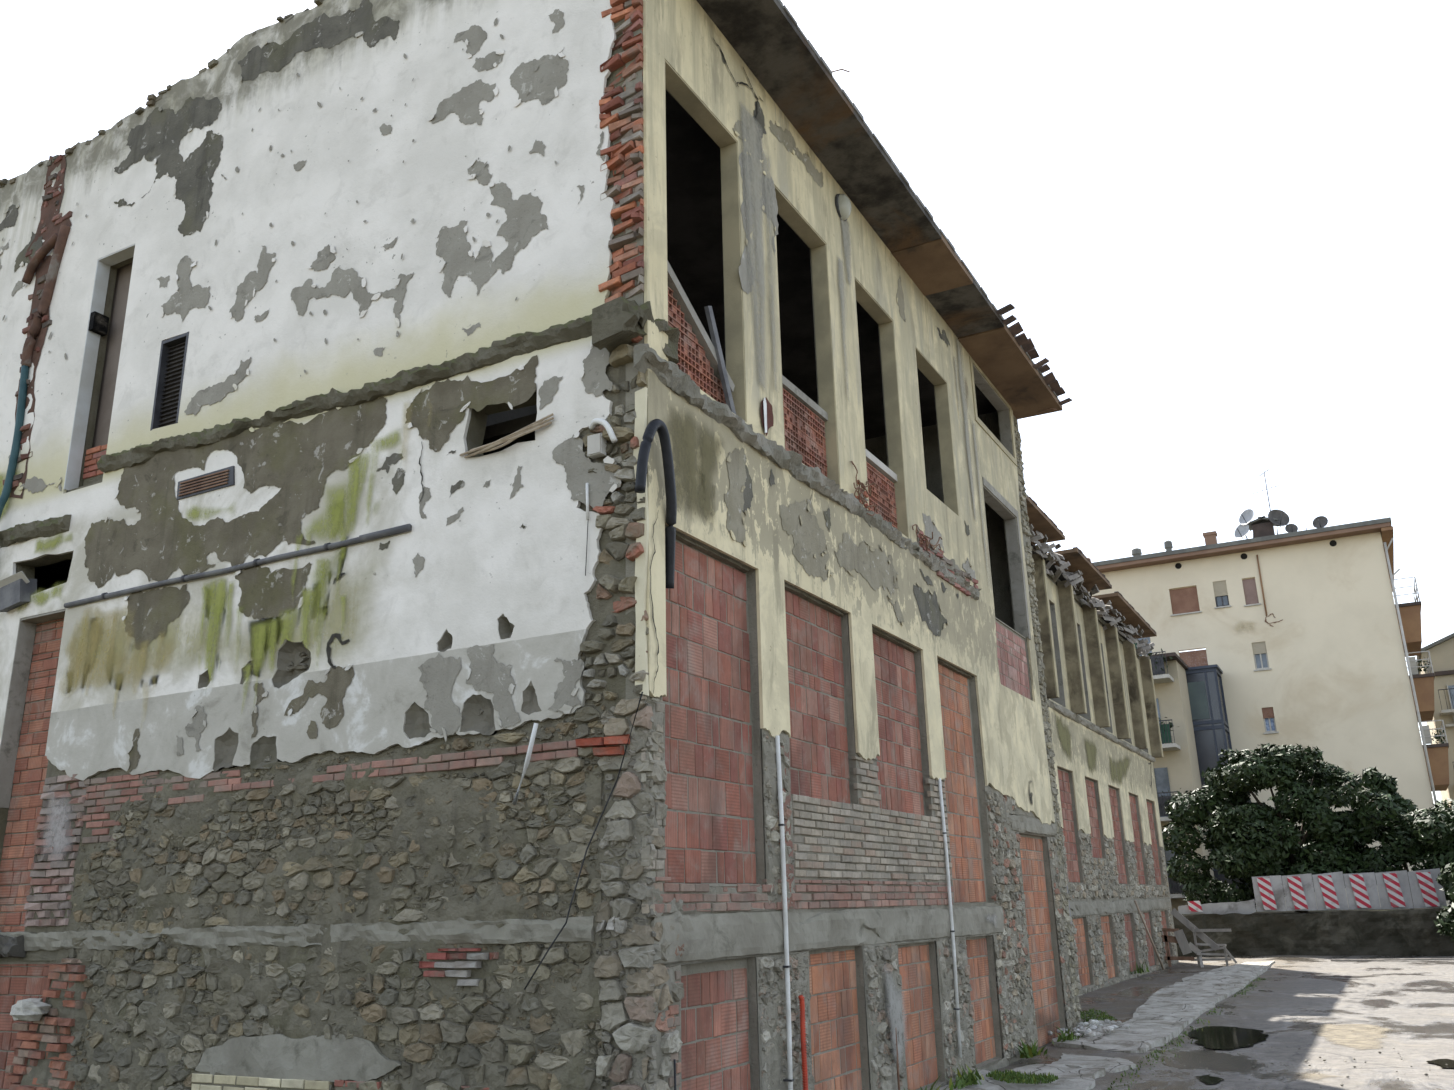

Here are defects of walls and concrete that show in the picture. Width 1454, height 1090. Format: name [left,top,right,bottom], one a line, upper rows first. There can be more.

flaking render [238,0,406,82]
flaking render [114,96,239,245]
flaking render [156,236,414,356]
flaking render [436,156,548,297]
flaking render [404,297,680,455]
water stain [76,580,232,683]
flaking render [84,397,387,650]
flaking render [176,640,354,772]
water stain [244,457,372,695]
flaking render [404,614,584,742]
crack [650,514,659,694]
flaking render [780,495,978,636]